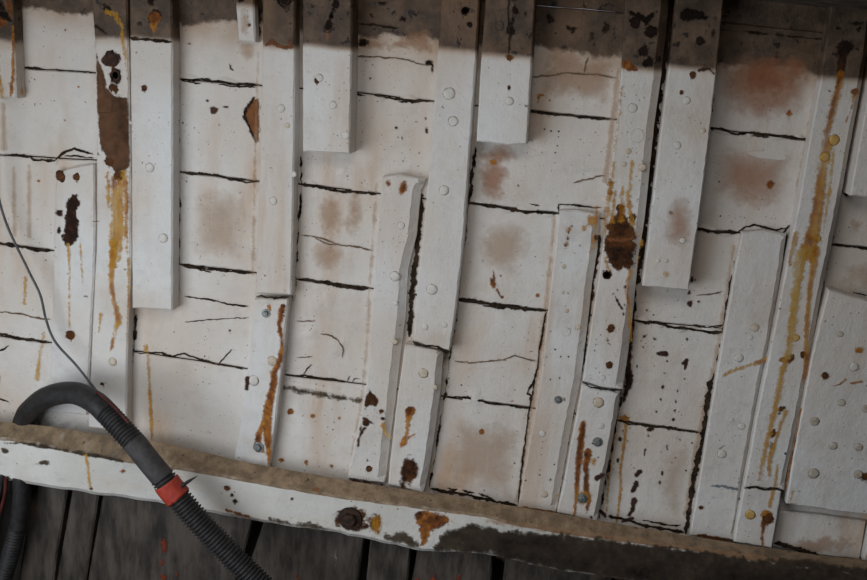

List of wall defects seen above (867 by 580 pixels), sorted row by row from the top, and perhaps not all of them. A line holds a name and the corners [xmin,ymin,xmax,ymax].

leakage [326,0,342,39]
leakage [732,61,800,116]
rust [55,194,83,339]
rust [104,157,131,350]
crack [132,315,243,370]
rust [254,304,285,465]
crack [179,156,376,322]
crack [407,193,547,506]
crack [465,148,601,241]
rust [583,160,643,341]
crack [581,0,735,534]
rust [759,39,859,545]